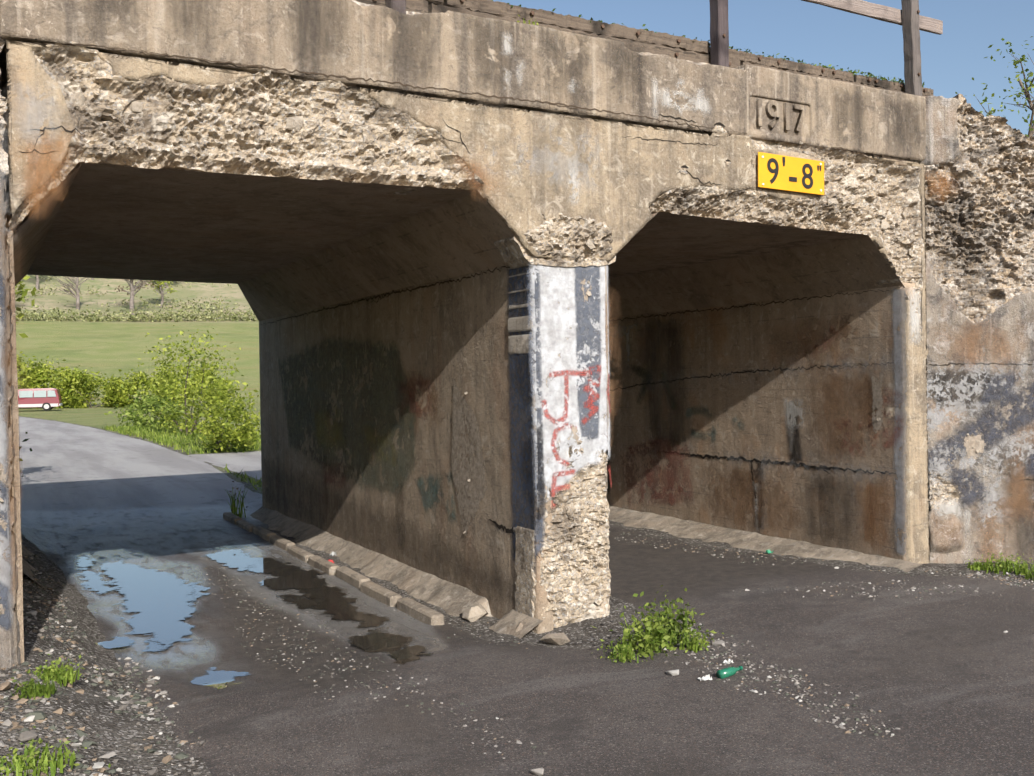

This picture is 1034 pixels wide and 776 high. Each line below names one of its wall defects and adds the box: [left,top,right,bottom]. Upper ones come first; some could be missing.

spalling [0,90,9,175]
crack [19,125,87,154]
spalling [7,41,485,233]
crack [19,41,747,146]
crack [439,118,470,153]
spalling [649,94,1034,334]
crack [609,362,894,391]
damp [787,401,802,462]
crack [658,451,896,502]
spalling [514,419,611,632]